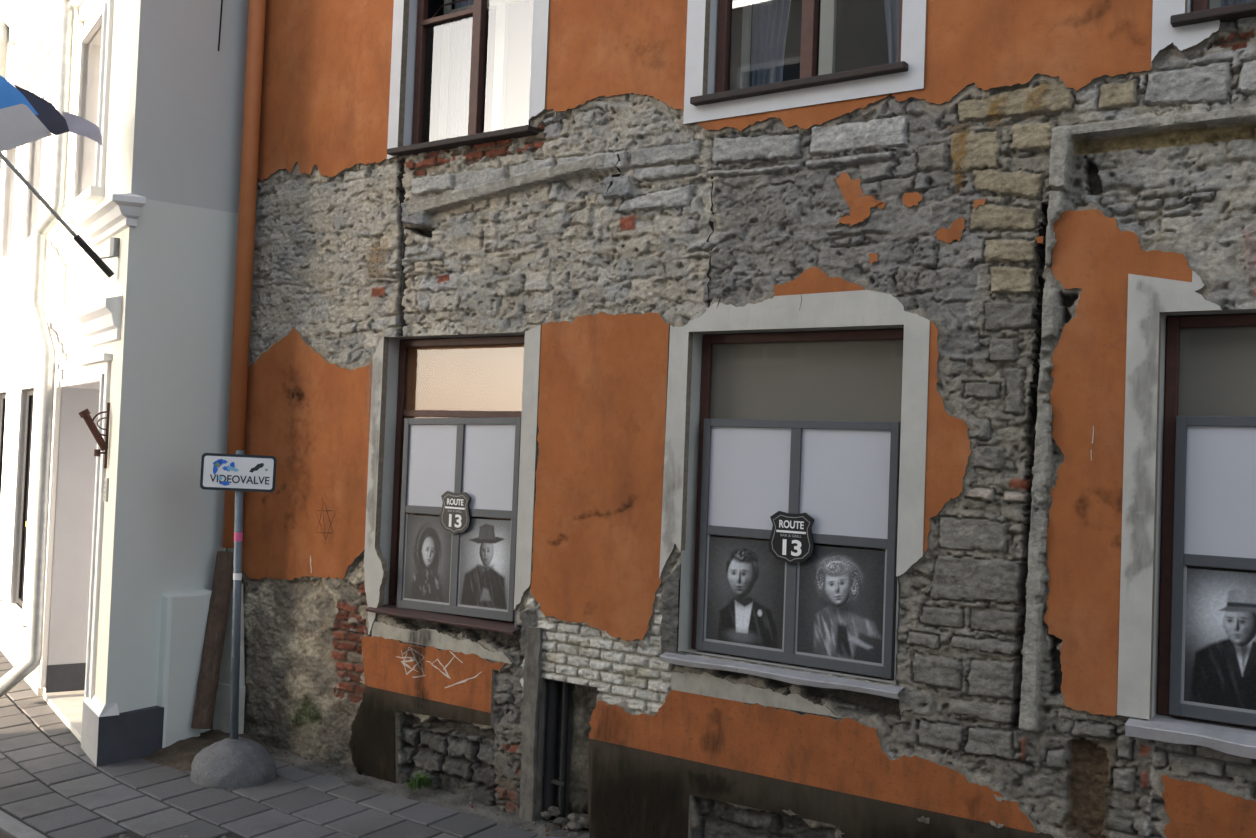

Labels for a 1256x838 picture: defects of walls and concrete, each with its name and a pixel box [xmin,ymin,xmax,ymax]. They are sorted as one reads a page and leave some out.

spalling [242,17,1256,838]